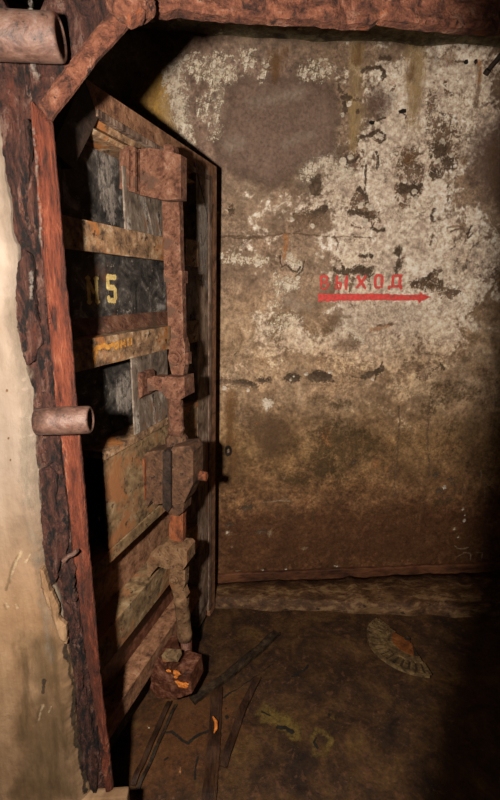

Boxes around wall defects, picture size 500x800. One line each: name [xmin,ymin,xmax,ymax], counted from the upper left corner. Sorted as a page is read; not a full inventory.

damp [135,54,196,148]
damp [260,272,300,343]
damp [288,401,381,485]
spalling [39,565,69,644]